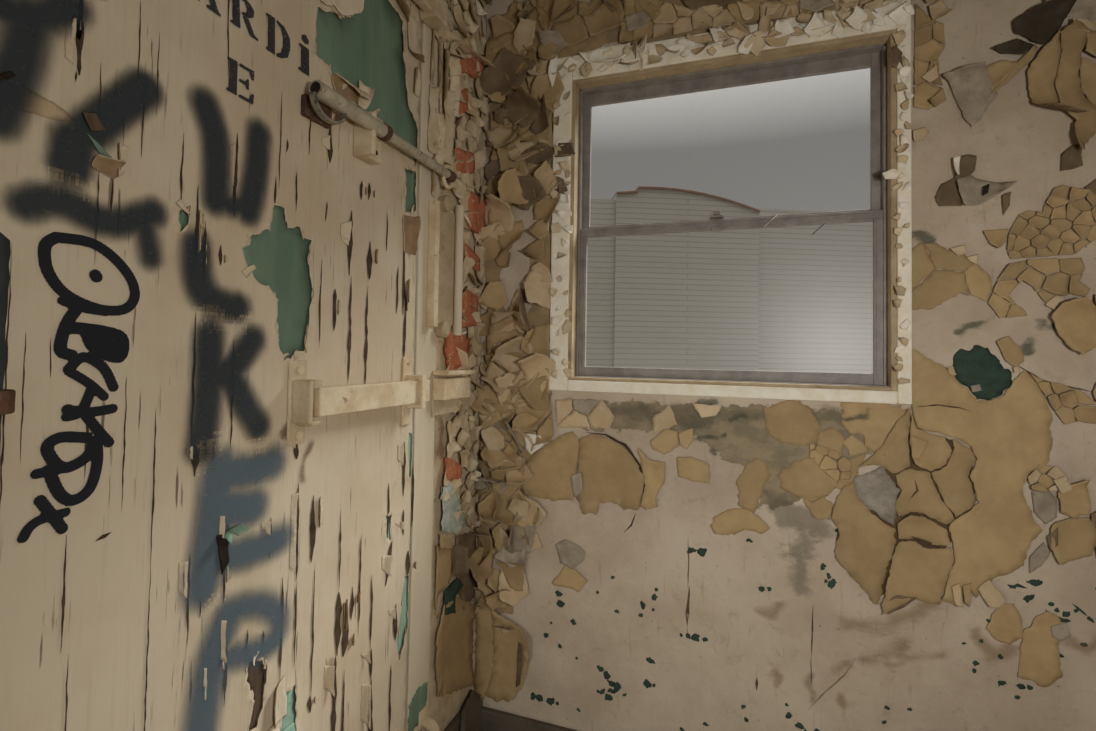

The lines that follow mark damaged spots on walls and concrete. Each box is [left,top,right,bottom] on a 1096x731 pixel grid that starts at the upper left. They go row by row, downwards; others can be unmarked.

peeling [27,92,128,179]
peeling [176,199,191,229]
peeling [241,206,314,360]
peeling [316,0,1096,731]
crack [920,403,969,411]
peeling [216,524,250,575]
crack [911,536,941,548]
peeling [245,652,296,731]